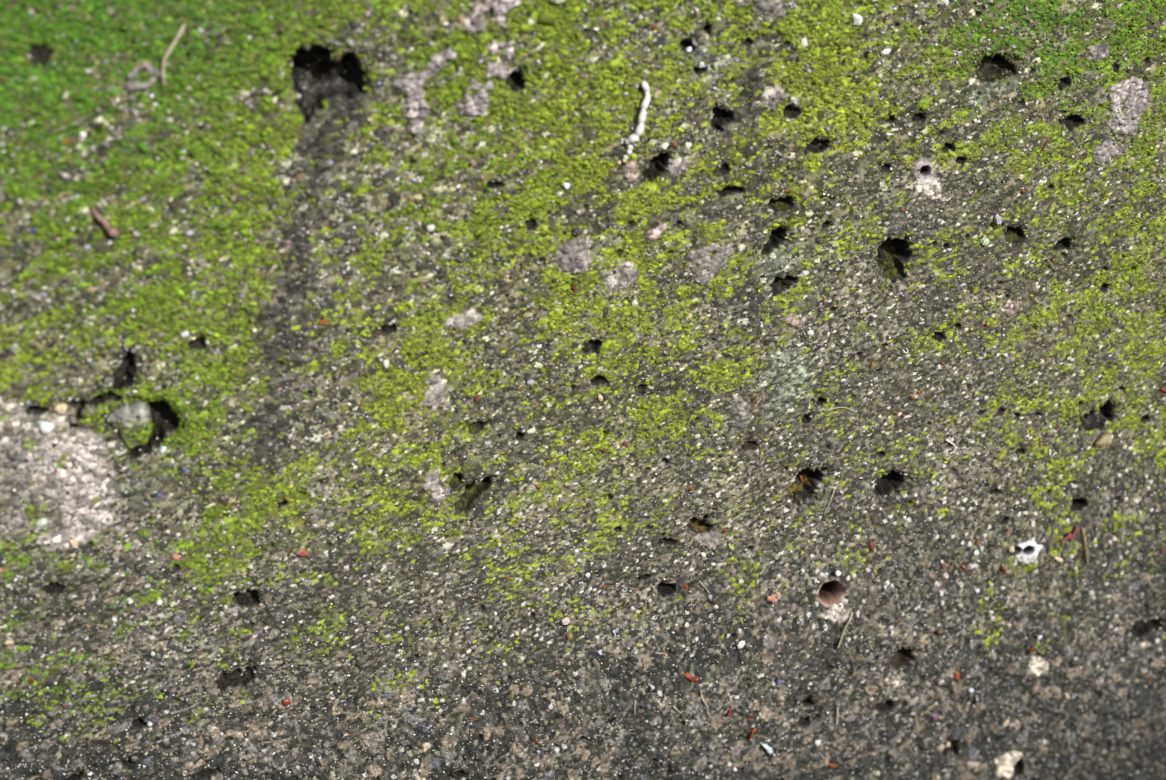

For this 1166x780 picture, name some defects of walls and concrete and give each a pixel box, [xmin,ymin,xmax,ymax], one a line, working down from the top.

leakage [858,181,956,251]
leakage [234,78,378,480]
leakage [700,52,795,476]
leakage [118,453,177,521]
leakage [741,532,772,623]